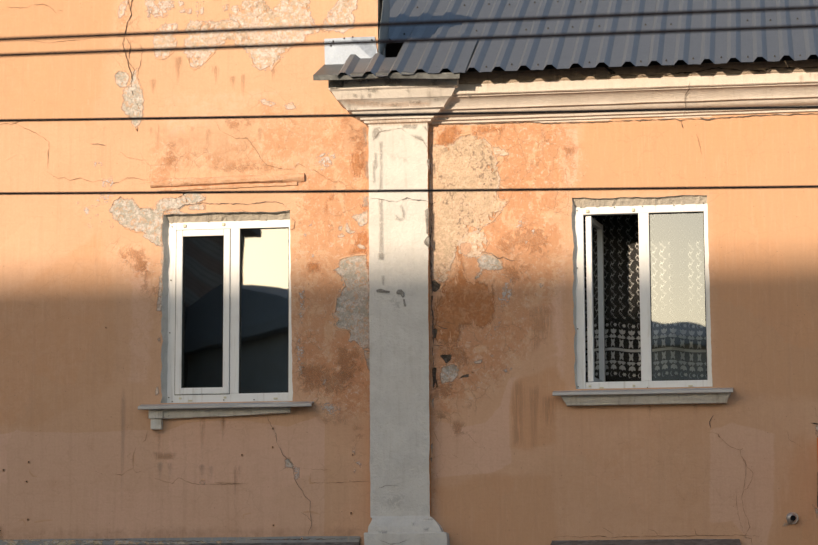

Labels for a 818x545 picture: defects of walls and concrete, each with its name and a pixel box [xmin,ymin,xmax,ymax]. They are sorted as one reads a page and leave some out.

crack [122,0,142,112]
peeling [145,0,358,71]
spalling [109,194,206,263]
spalling [424,133,511,300]
spalling [332,244,406,370]
spalling [432,355,482,388]
crack [250,416,393,540]
crack [562,416,755,542]